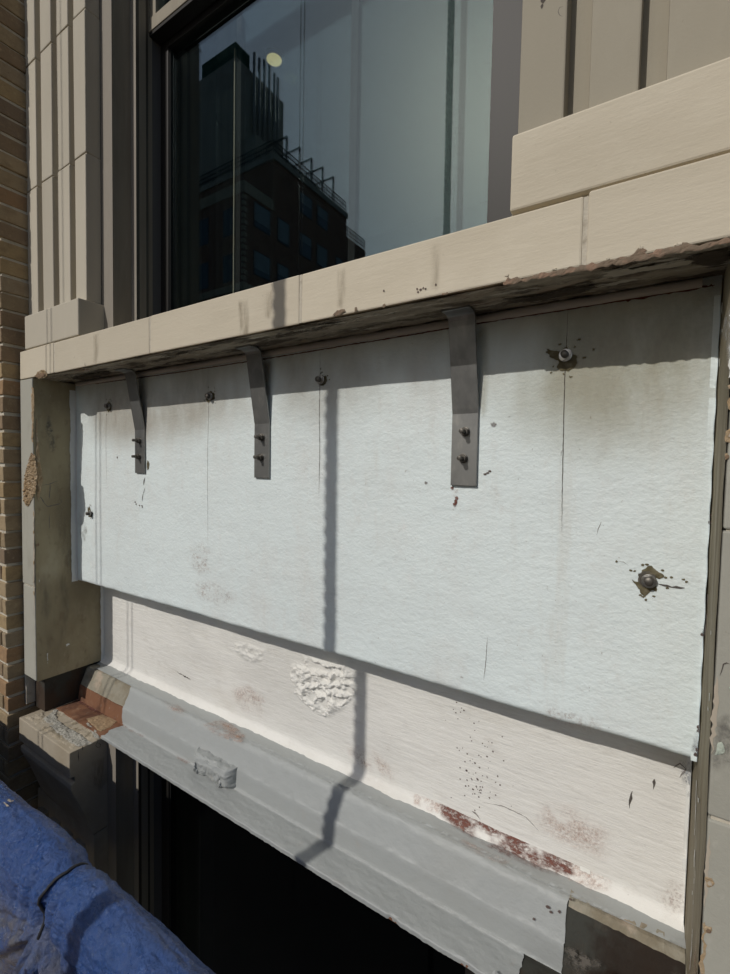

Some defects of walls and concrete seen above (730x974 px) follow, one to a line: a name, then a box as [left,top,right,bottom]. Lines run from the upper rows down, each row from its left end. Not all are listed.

peeling [502,237,730,304]
spalling [22,370,47,610]
rust [441,806,591,874]